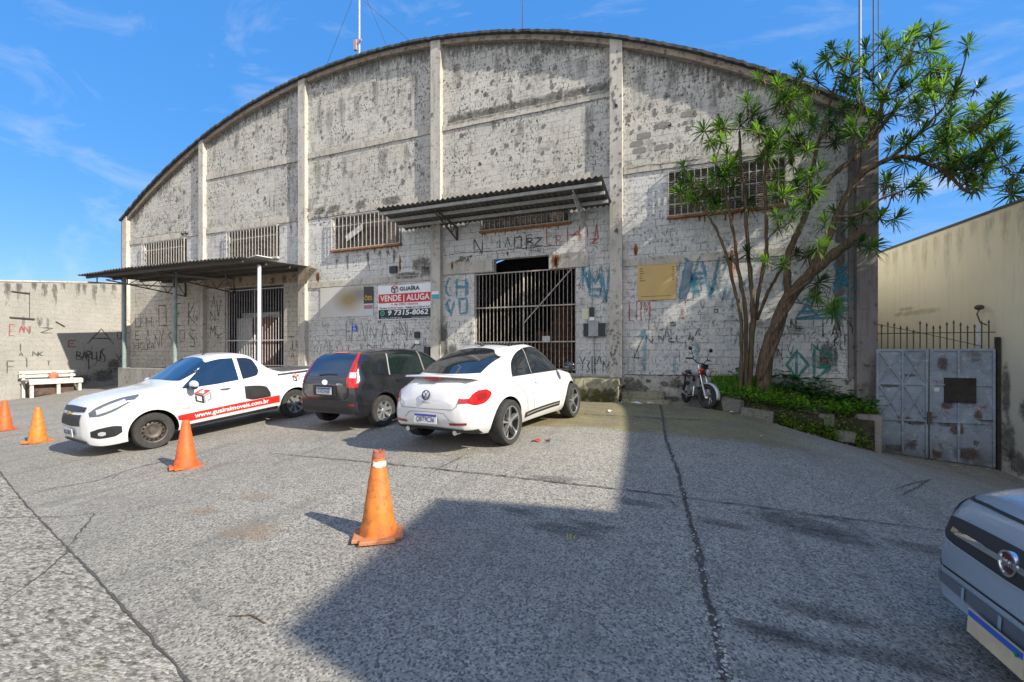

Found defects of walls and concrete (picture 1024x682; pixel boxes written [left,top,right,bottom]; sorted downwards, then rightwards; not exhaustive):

leakage [448,78,611,125]
leakage [5,283,115,297]
leakage [1001,367,1024,476]
crack [0,513,95,605]